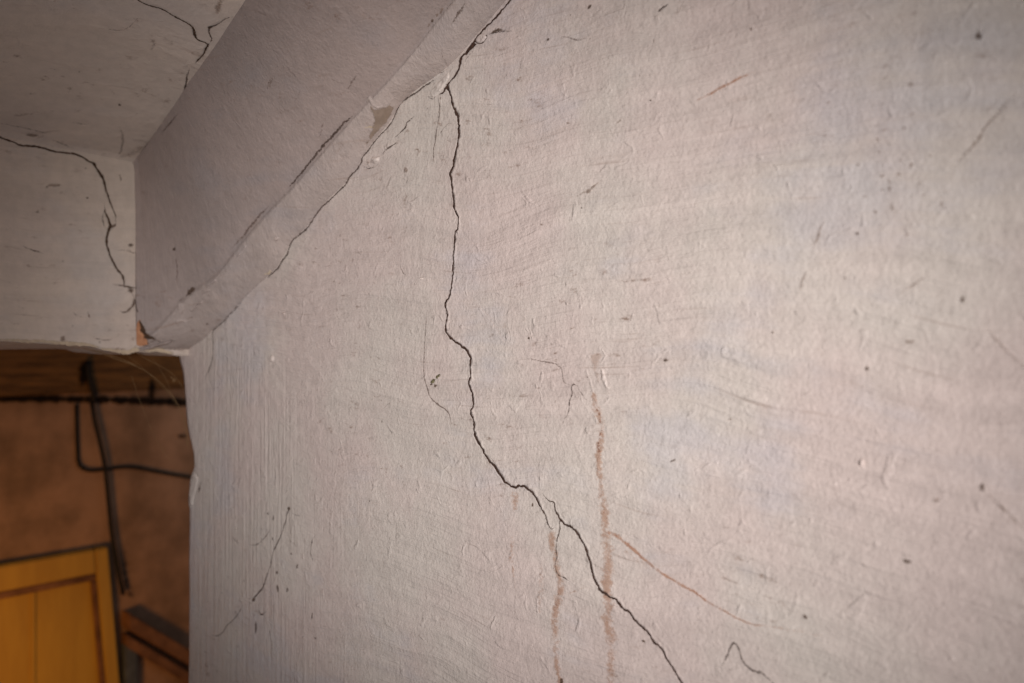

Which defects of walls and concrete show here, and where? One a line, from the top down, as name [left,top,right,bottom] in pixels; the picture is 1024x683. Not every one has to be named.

crack [138,0,229,90]
crack [0,136,131,285]
crack [269,0,686,683]
corrosion [608,532,706,601]